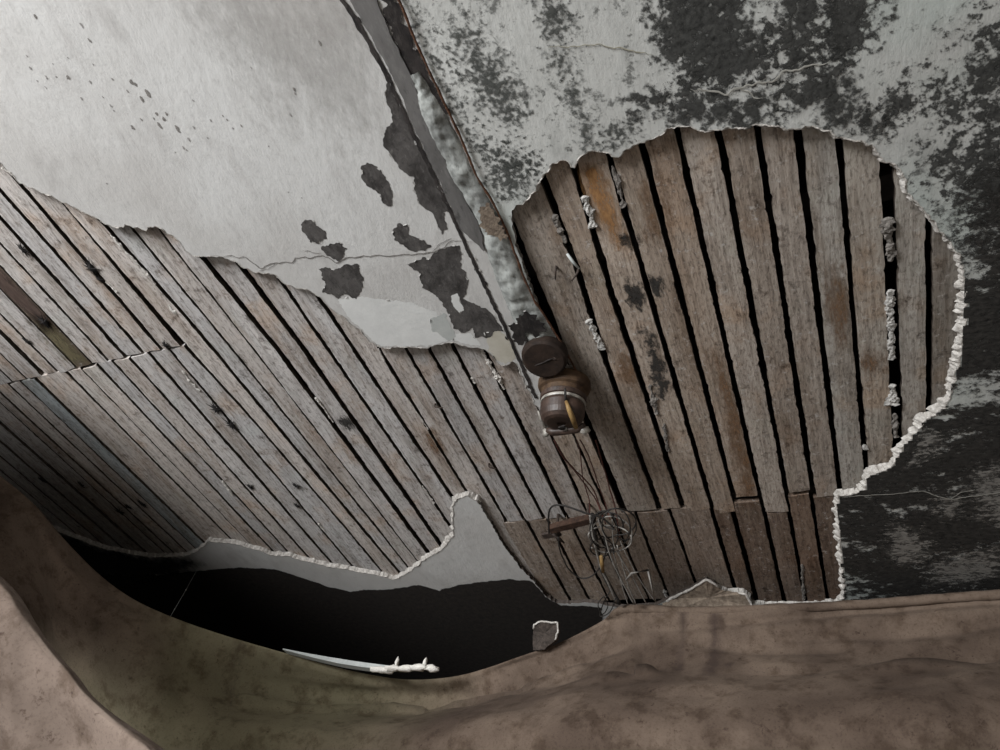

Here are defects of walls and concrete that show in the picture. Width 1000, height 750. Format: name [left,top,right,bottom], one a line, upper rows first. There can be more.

flaking render [130,112,195,153]
crack [210,0,553,399]
mould [410,6,547,203]
flaking render [0,124,968,605]
water stain [531,0,1000,600]